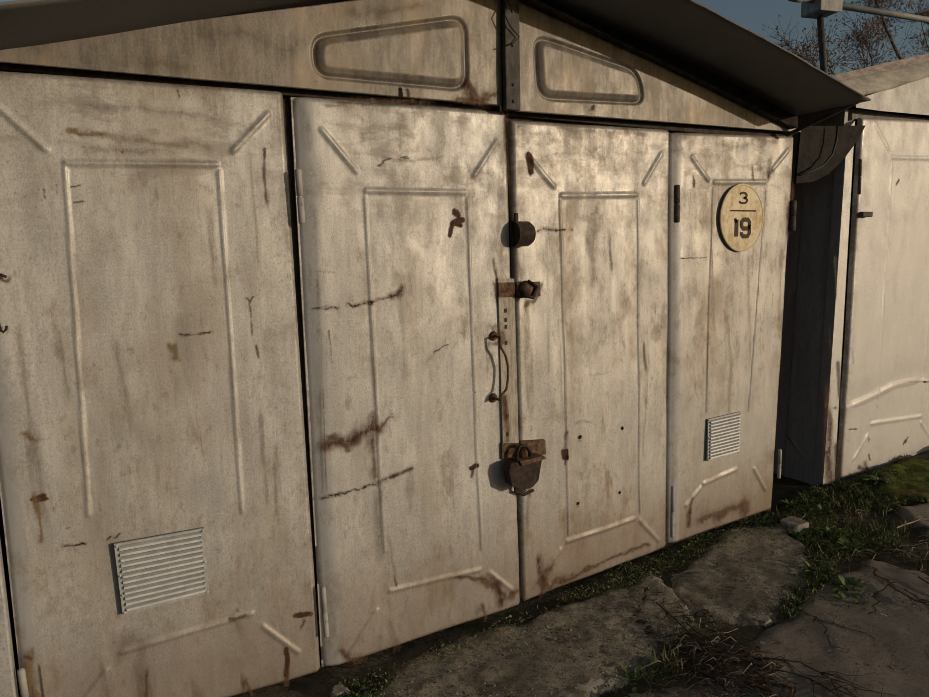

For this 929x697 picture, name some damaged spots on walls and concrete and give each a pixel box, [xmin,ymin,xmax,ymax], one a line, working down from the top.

rust [448,208,465,238]
rust [502,396,510,442]
rust [323,416,390,478]
rust [30,493,49,543]
rust [458,576,519,605]
rust [538,543,650,599]